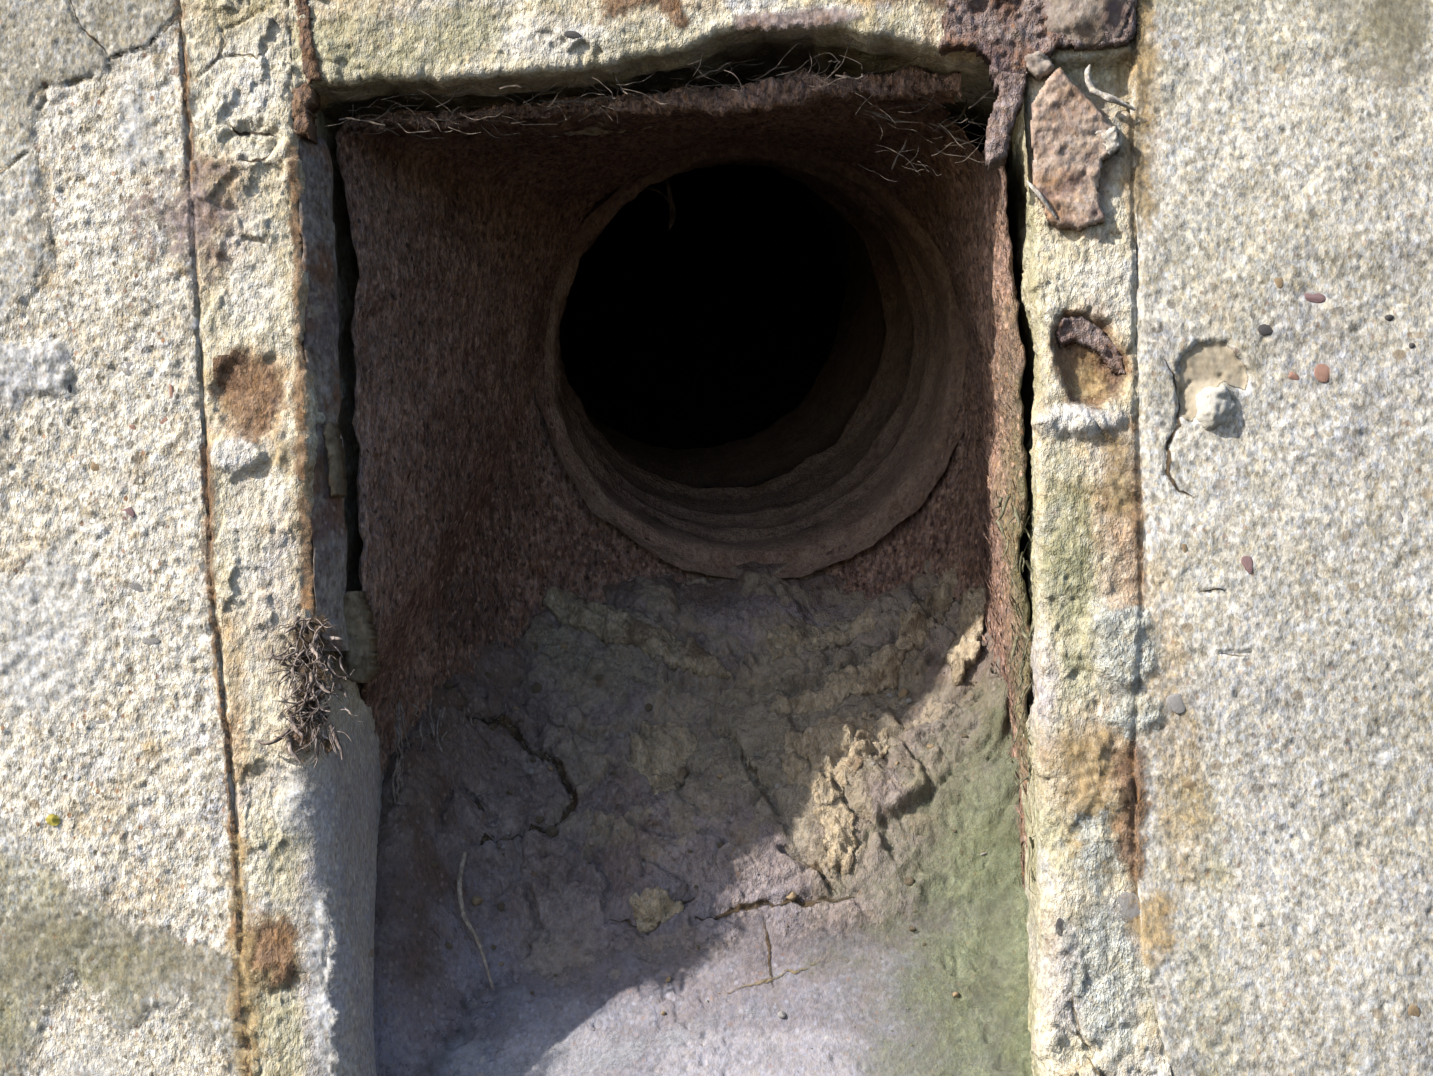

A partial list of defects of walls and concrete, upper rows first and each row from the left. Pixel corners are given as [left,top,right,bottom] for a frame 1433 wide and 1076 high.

crack [29,1,179,107]
rust [1024,0,1153,243]
rust [210,82,321,480]
spalling [1177,341,1248,421]
rust [287,497,339,755]
rust [200,447,309,1076]
rust [1064,730,1152,881]
rust [1130,892,1174,967]
crack [1062,978,1105,1076]